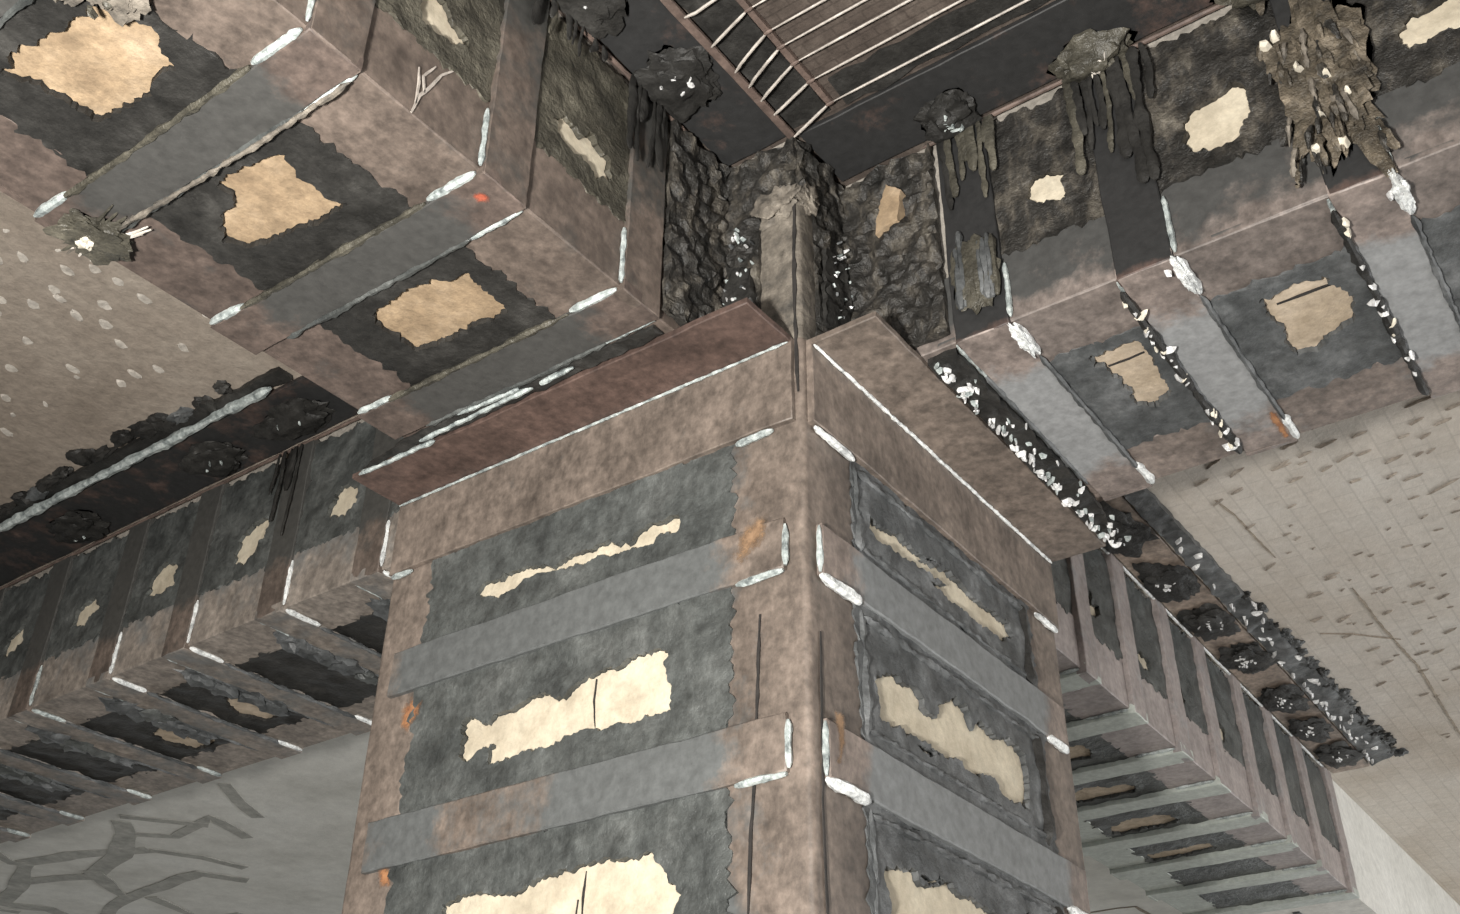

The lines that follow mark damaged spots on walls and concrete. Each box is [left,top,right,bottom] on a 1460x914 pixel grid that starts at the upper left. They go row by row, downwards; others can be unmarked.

peeling [2,6,174,115]
peeling [219,154,340,243]
peeling [376,273,505,347]
peeling [1264,265,1417,376]
peeling [480,519,680,598]
peeling [463,651,671,764]
crack [754,614,762,719]
crack [819,631,829,914]
peeling [875,676,1024,804]
crack [0,784,265,914]
peeling [446,853,681,914]
crack [747,785,756,914]